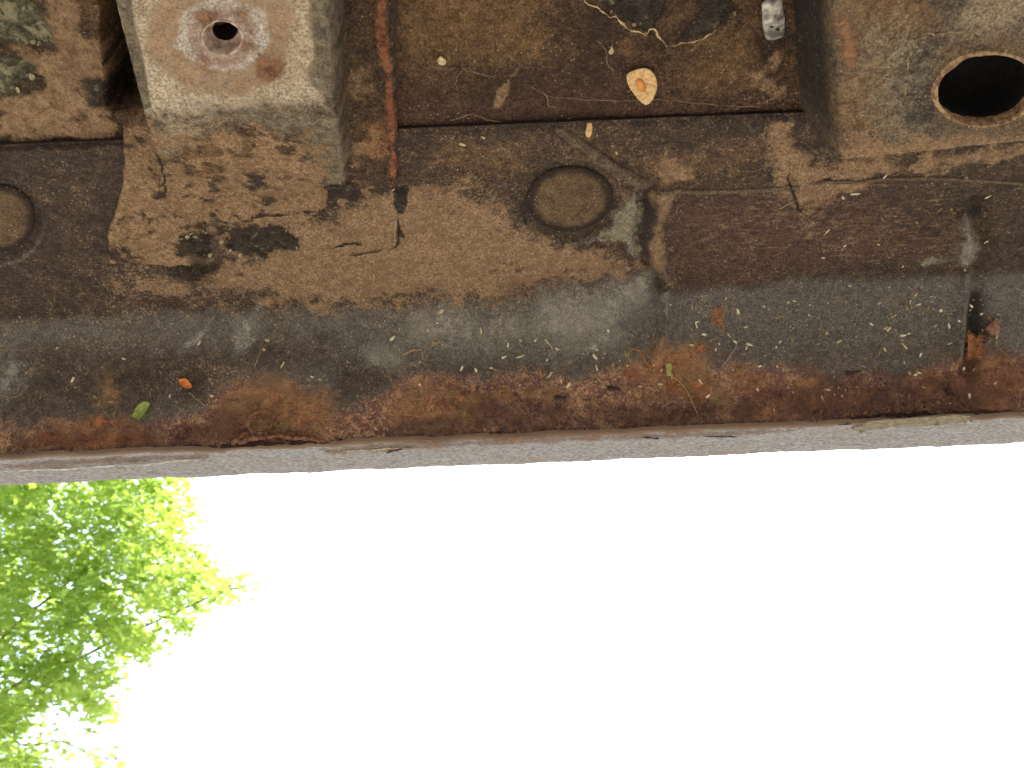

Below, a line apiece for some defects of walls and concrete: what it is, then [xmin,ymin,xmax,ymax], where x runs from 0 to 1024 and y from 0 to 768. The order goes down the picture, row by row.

rust [366,0,397,185]
crack [156,154,167,195]
crack [778,172,802,214]
crack [332,215,405,256]
damp [0,350,35,402]
rust [7,373,187,454]
damp [230,304,263,356]
damp [367,301,482,373]
rust [389,381,509,445]
damp [530,267,667,369]
rust [622,340,871,429]
rust [902,333,1024,413]